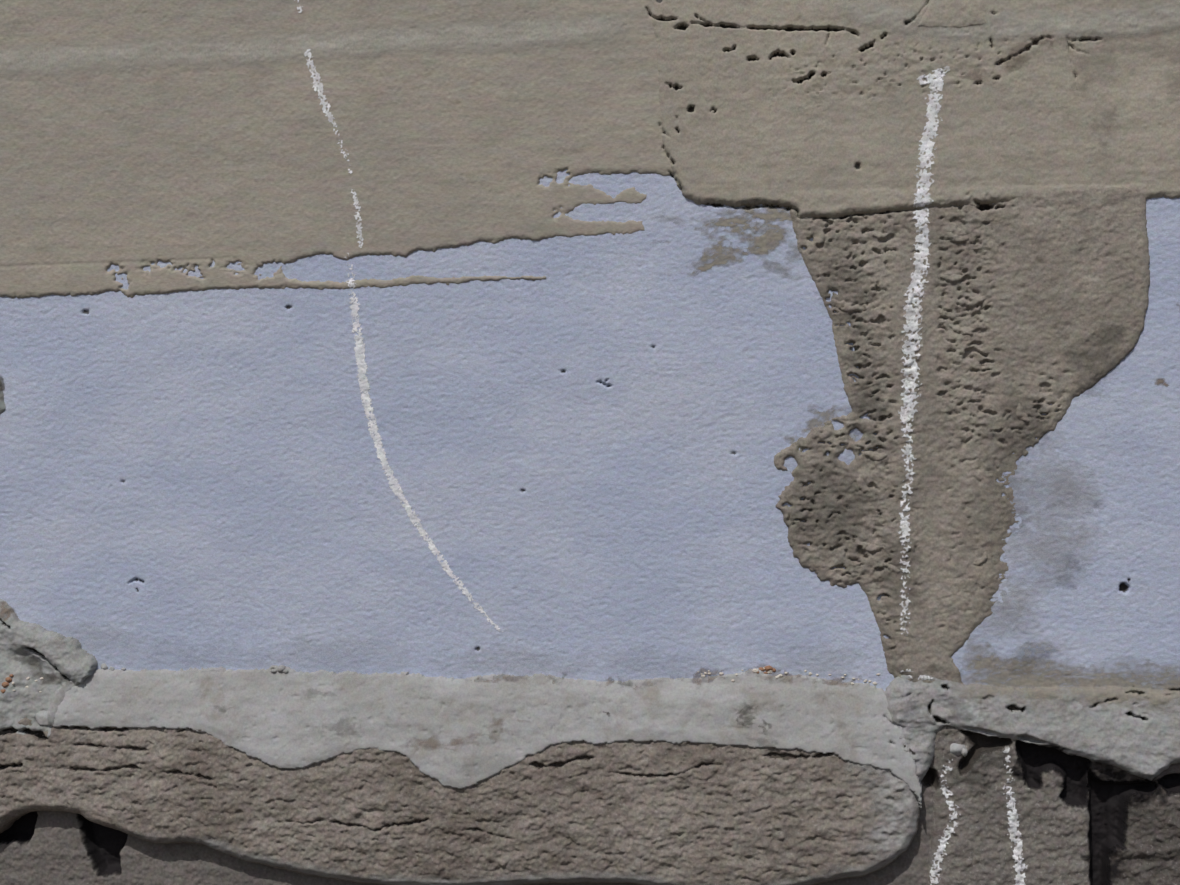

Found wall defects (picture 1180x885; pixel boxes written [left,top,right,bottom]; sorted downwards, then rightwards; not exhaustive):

crack [649,13,910,84]
crack [976,13,1043,85]
peeling [864,449,887,461]
crack [0,726,147,772]
crack [532,756,593,769]
crack [767,752,834,760]
crack [169,770,212,780]
crack [621,763,714,777]
crack [288,819,427,831]